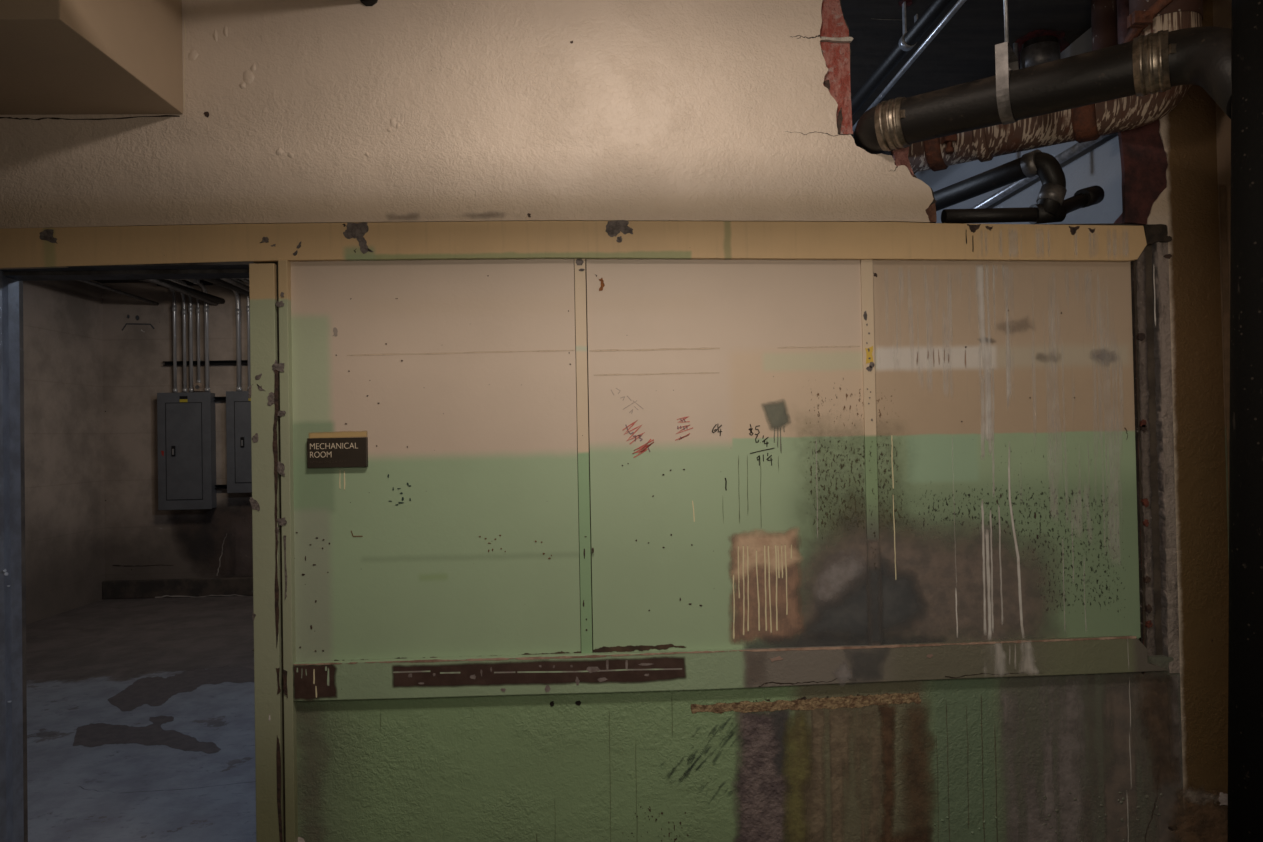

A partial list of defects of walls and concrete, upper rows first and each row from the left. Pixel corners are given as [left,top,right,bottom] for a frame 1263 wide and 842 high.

flaking render [820,0,854,135]
flaking render [891,146,914,176]
flaking render [925,203,937,223]
flaking render [1118,120,1168,225]
peeling [248,360,298,648]
water stain [805,266,1130,673]
peeling [276,646,337,700]
peeling [393,657,686,692]
water stain [735,706,930,842]
water stain [996,688,1090,842]
water stain [1105,672,1181,842]